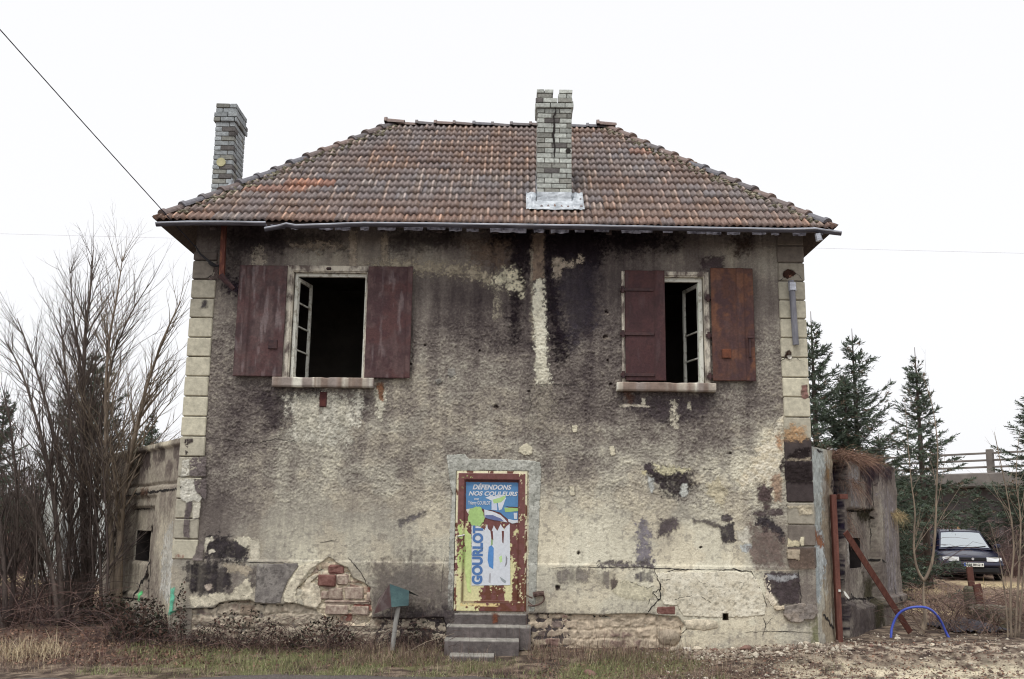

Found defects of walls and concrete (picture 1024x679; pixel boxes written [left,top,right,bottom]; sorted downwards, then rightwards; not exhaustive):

crack [550,108,558,157]
water stain [251,244,267,265]
water stain [289,229,685,428]
water stain [282,382,387,447]
flaking render [737,416,827,623]
flaking render [189,536,446,645]
crack [590,566,834,634]